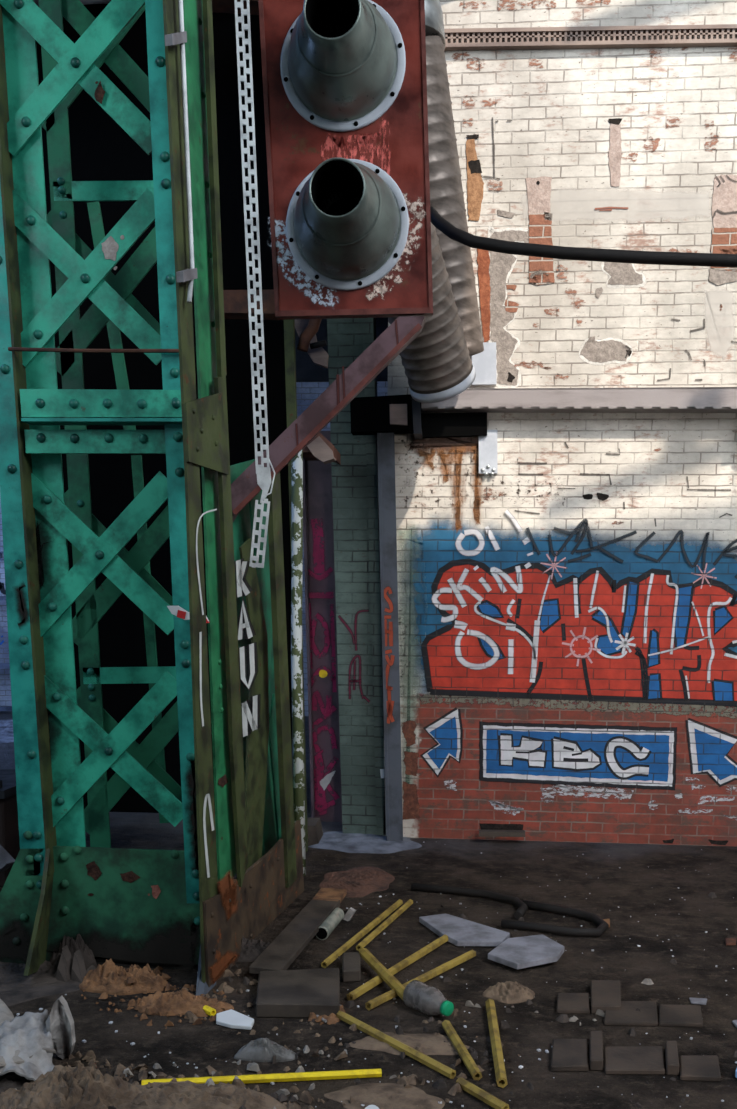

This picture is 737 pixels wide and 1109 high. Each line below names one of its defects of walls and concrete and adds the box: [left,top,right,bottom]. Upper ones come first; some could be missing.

peeling [321,119,391,175]
peeling [268,217,338,306]
peeling [366,194,426,300]
peeling [462,95,737,388]
rust [409,433,481,529]
rust [86,861,102,881]